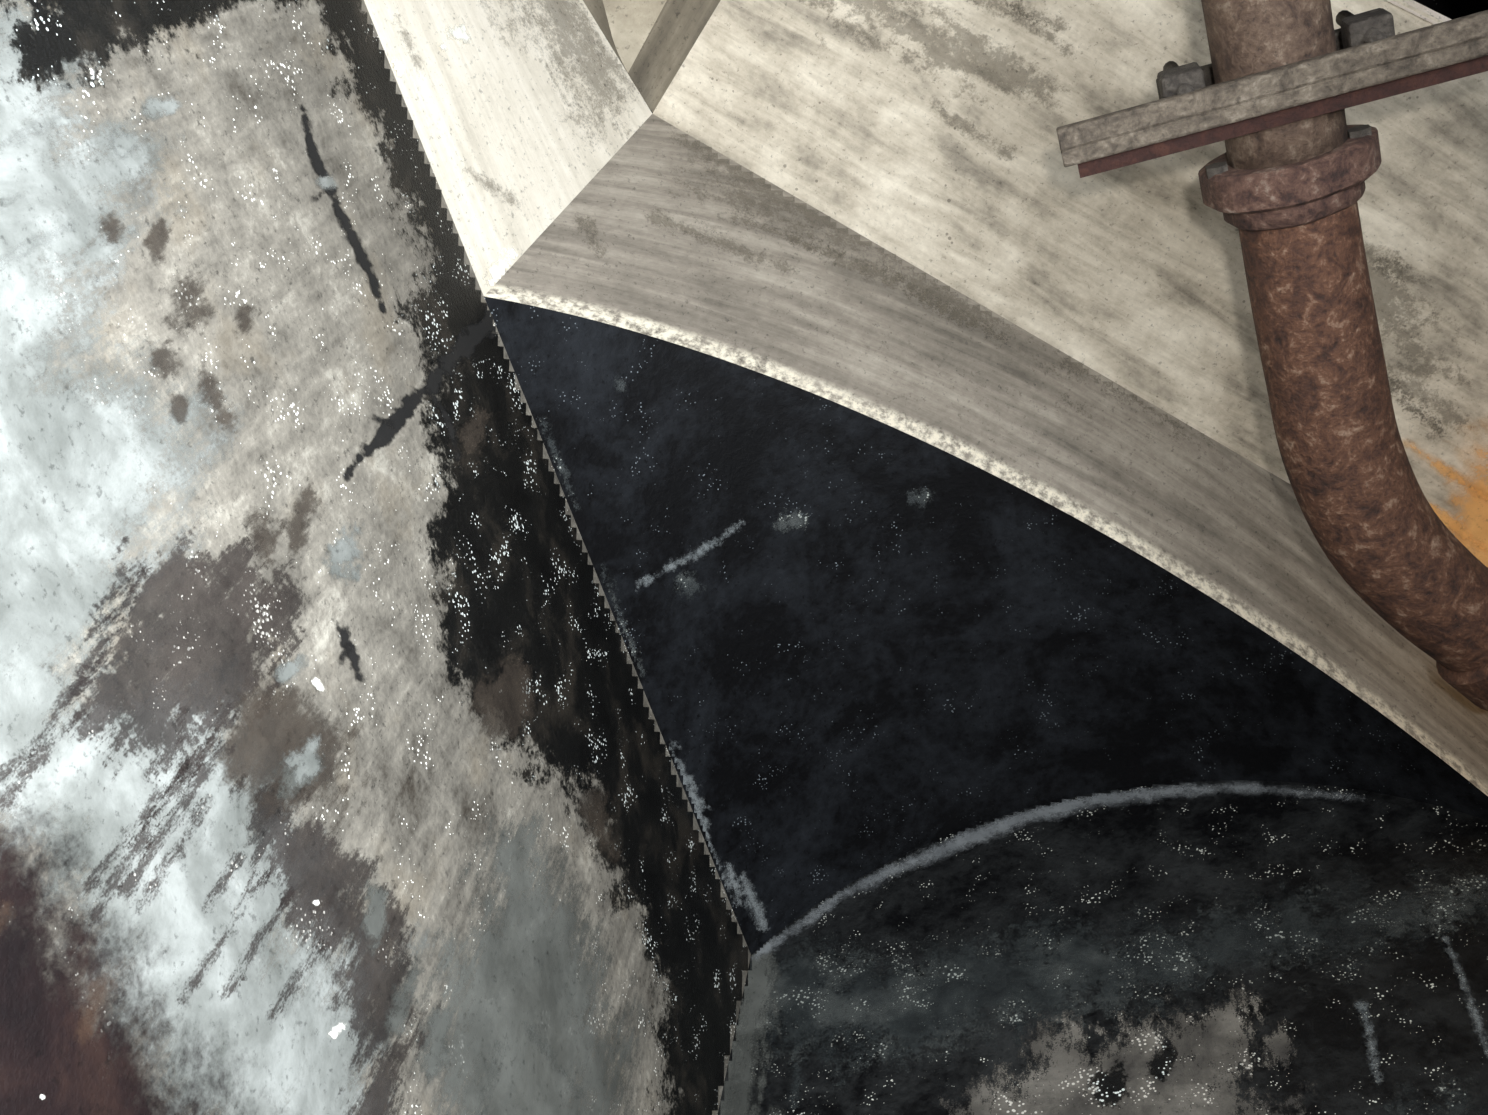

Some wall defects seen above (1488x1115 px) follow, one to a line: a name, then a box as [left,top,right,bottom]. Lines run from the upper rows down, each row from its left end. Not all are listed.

crack [301,105,386,313]
water stain [0,5,388,1115]
crack [344,305,498,481]
water stain [539,418,579,509]
water stain [600,568,645,677]
corrosion [1428,451,1488,568]
water stain [669,747,711,847]
water stain [406,815,646,1115]